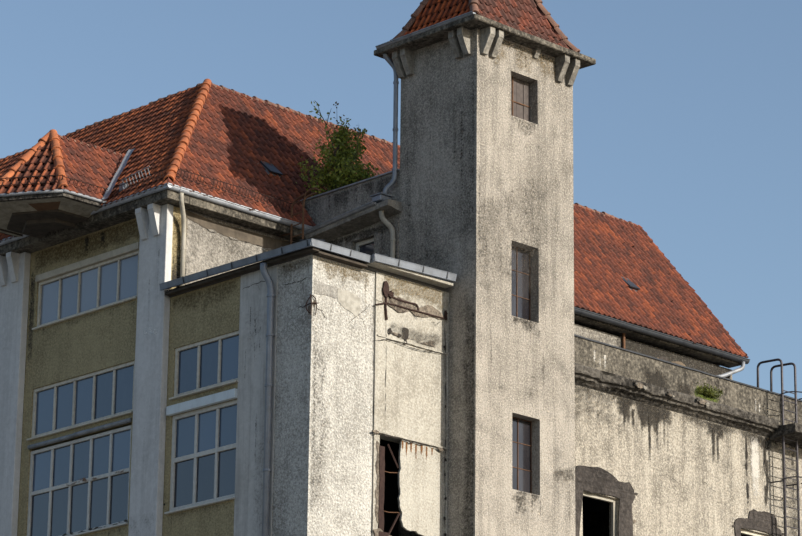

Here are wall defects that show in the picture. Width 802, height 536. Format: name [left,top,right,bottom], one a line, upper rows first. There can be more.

rust [378,444,400,536]
spalling [372,430,446,536]
leakage [575,384,672,456]
leakage [687,414,776,505]